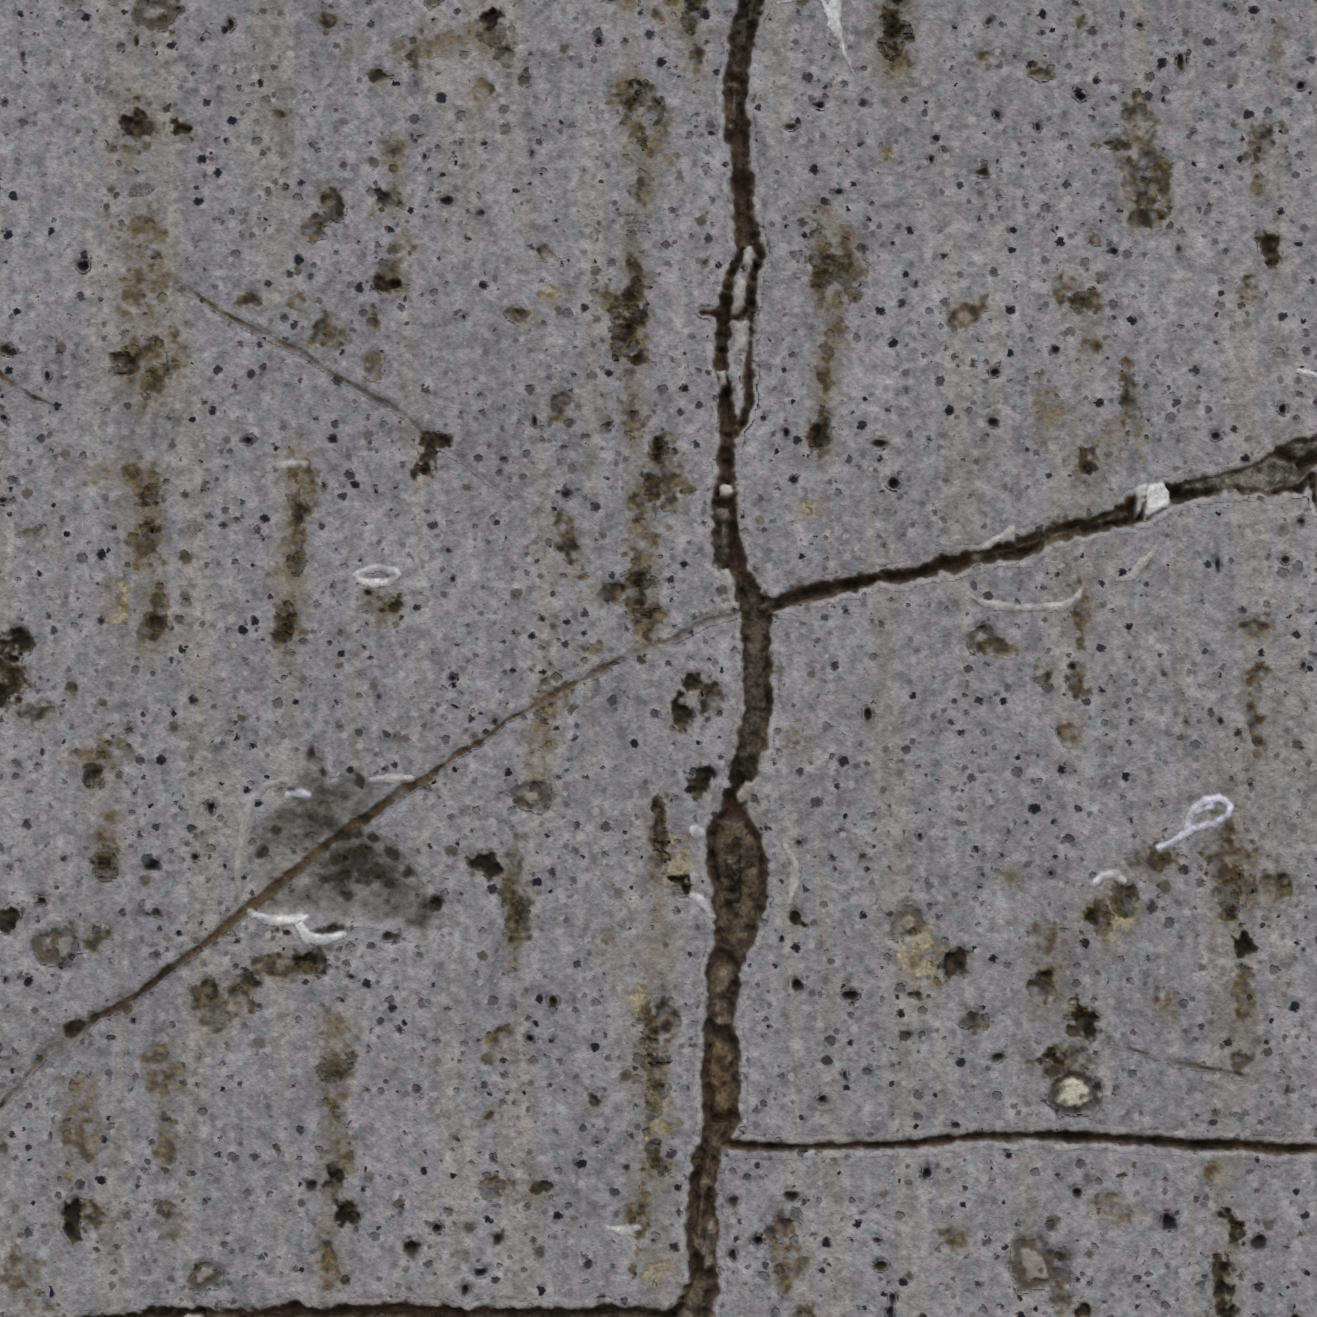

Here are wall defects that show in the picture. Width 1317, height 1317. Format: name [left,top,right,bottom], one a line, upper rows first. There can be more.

crack [0,368,64,409]
crack [170,275,513,500]
crack [668,0,1317,1317]
crack [0,610,739,1112]
crack [15,1291,677,1317]